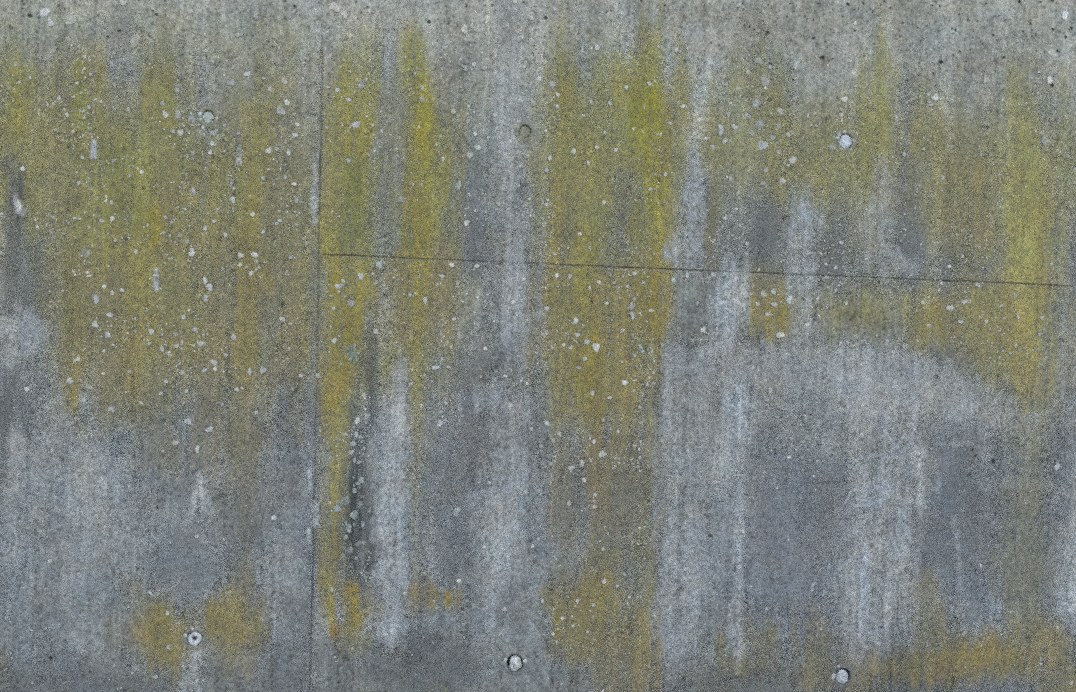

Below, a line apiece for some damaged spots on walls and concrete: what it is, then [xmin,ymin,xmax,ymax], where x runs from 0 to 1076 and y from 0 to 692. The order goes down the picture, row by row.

leakage [4,161,24,252]
leakage [7,60,38,141]
leakage [158,76,173,133]
leakage [451,16,538,342]
leakage [0,377,36,554]
leakage [0,310,38,361]
leakage [32,441,128,561]
leakage [284,75,415,679]
leakage [426,377,532,629]
leakage [572,76,1002,687]
leakage [727,505,812,692]